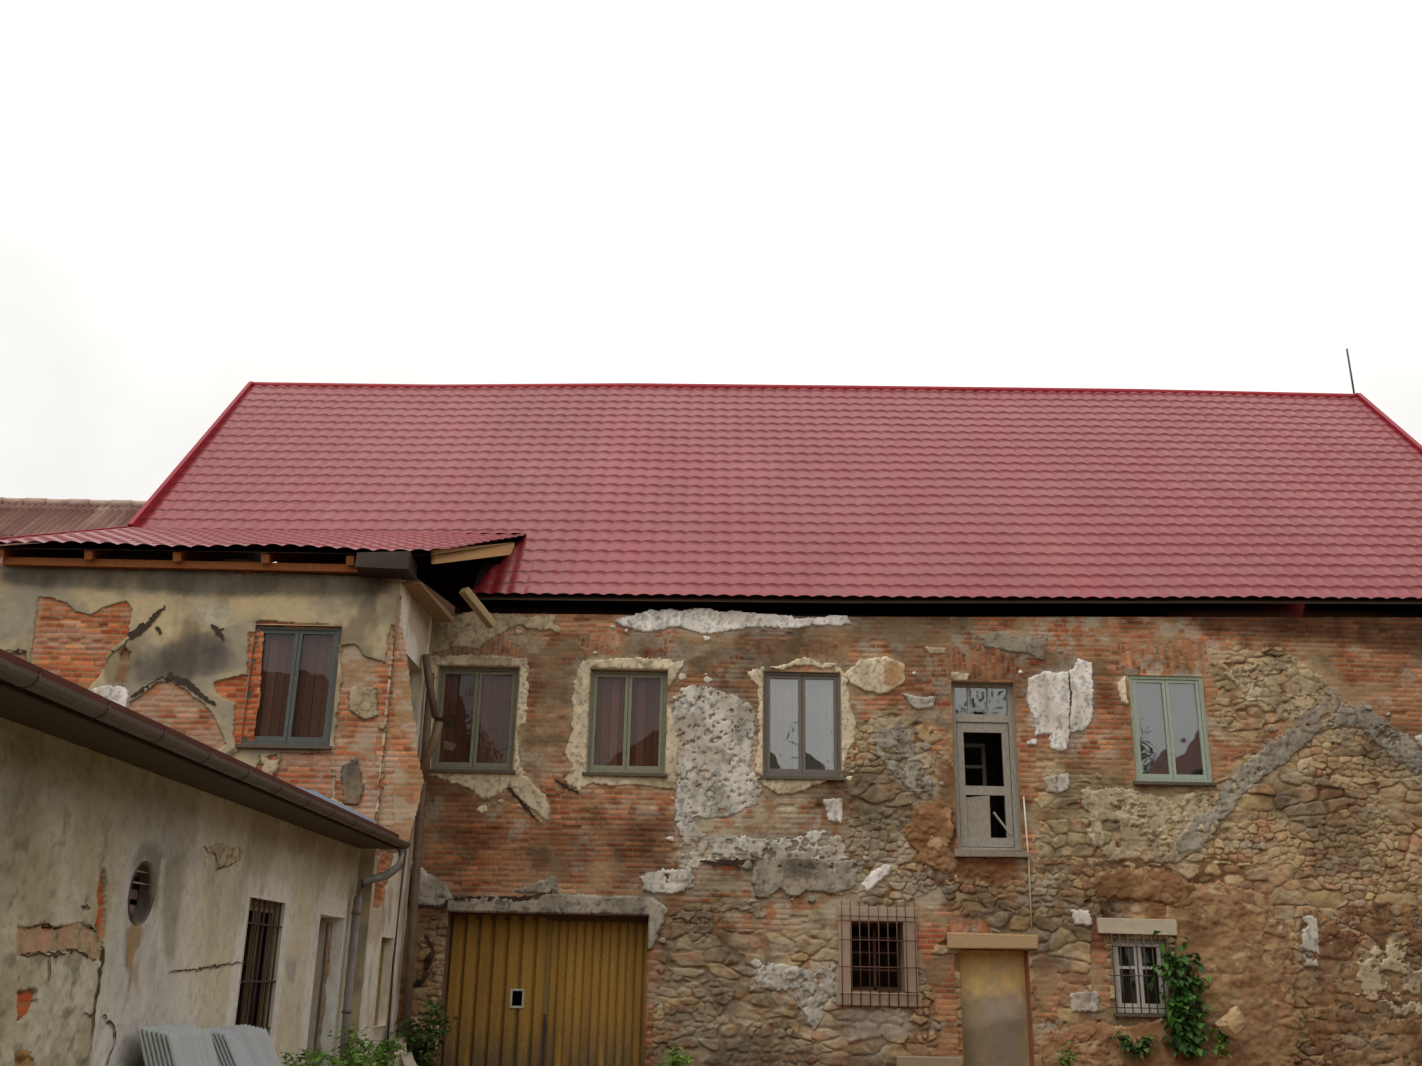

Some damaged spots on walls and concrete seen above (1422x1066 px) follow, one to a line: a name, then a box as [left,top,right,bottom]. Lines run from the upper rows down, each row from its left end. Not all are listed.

flaking render [951,672,969,682]
flaking render [975,632,1094,752]
flaking render [1117,676,1129,705]
flaking render [11,595,946,961]
flaking render [1042,773,1217,866]
flaking render [1071,909,1093,927]
crack [169,961,246,973]
spalling [16,989,33,1021]
flaking render [748,956,839,1030]
flaking render [1069,990,1100,1013]
flaking render [1286,901,1422,1066]
spalling [14,1049,34,1066]